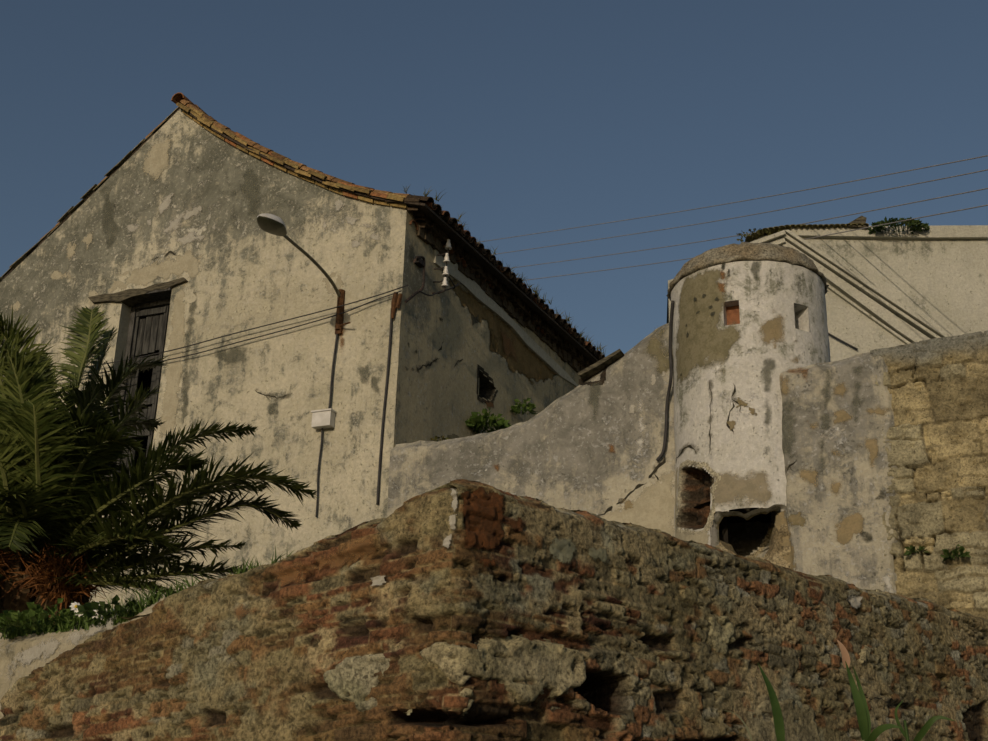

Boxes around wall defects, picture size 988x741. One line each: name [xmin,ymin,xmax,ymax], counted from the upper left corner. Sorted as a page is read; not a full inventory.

damp [182,291,196,422]
damp [216,348,246,363]
damp [358,366,379,392]
crack [417,341,463,370]
spalling [449,280,556,385]
spalling [579,367,608,386]
spalling [647,269,740,385]
spalling [760,315,784,348]
crack [597,381,748,516]
efflorescence [443,488,458,548]
spalling [601,459,721,544]
efflorescence [371,575,386,586]